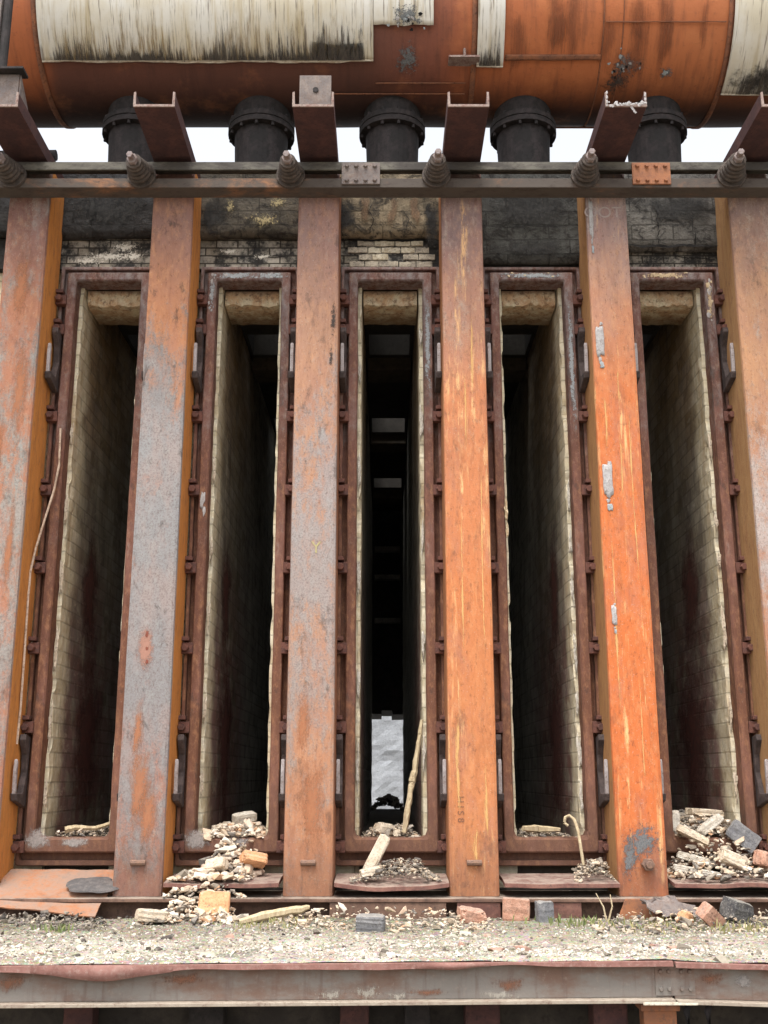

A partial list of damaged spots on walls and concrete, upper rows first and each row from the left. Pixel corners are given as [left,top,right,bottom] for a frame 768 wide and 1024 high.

leakage [53,14,365,60]
peeling [600,48,647,114]
peeling [595,322,605,368]
peeling [602,461,614,511]
rust [3,510,13,582]
leakage [82,541,98,645]
leakage [681,540,700,643]
rust [139,630,152,669]
leakage [74,664,99,812]
leakage [678,669,709,808]
rust [132,713,155,841]
peeling [622,823,662,881]